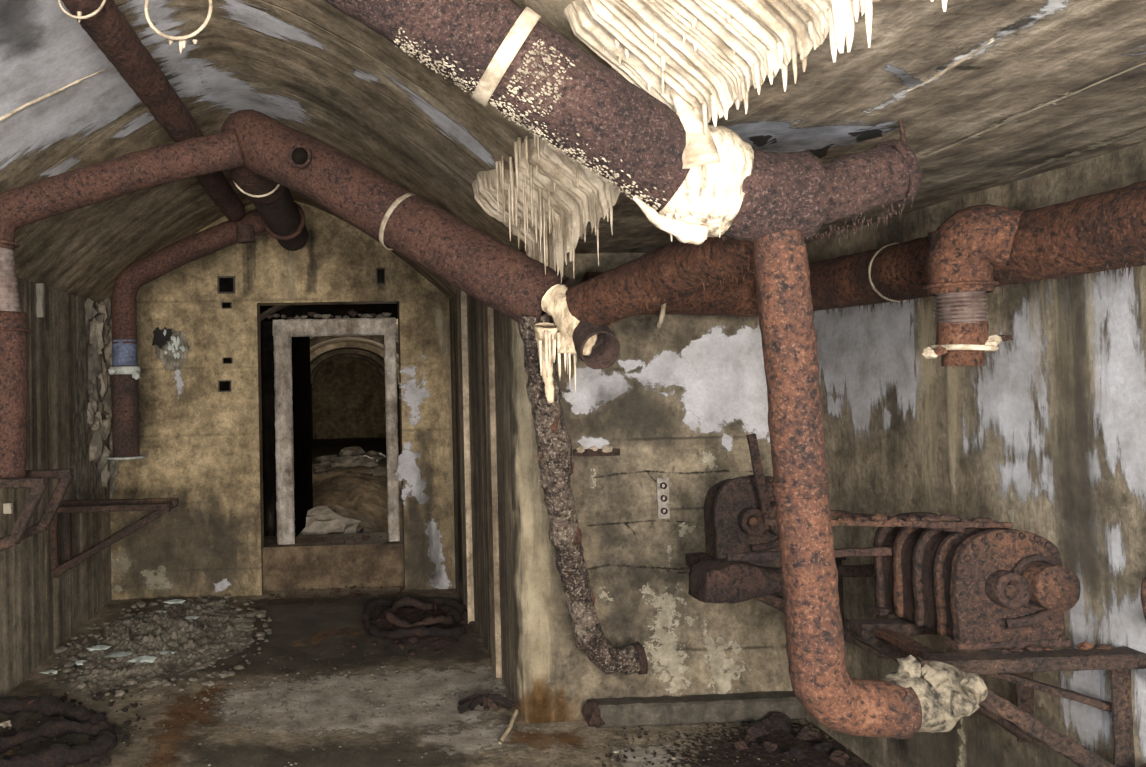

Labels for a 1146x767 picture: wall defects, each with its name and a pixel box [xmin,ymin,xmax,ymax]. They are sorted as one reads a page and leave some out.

spalling [152,327,190,399]
peeling [399,354,430,428]
peeling [562,325,770,472]
peeling [813,298,925,437]
peeling [963,276,1070,505]
peeling [1083,267,1146,502]
peeling [395,442,428,507]
peeling [425,518,452,589]
peeling [1069,523,1146,653]
peeling [1060,670,1112,752]
peeling [1134,668,1146,763]